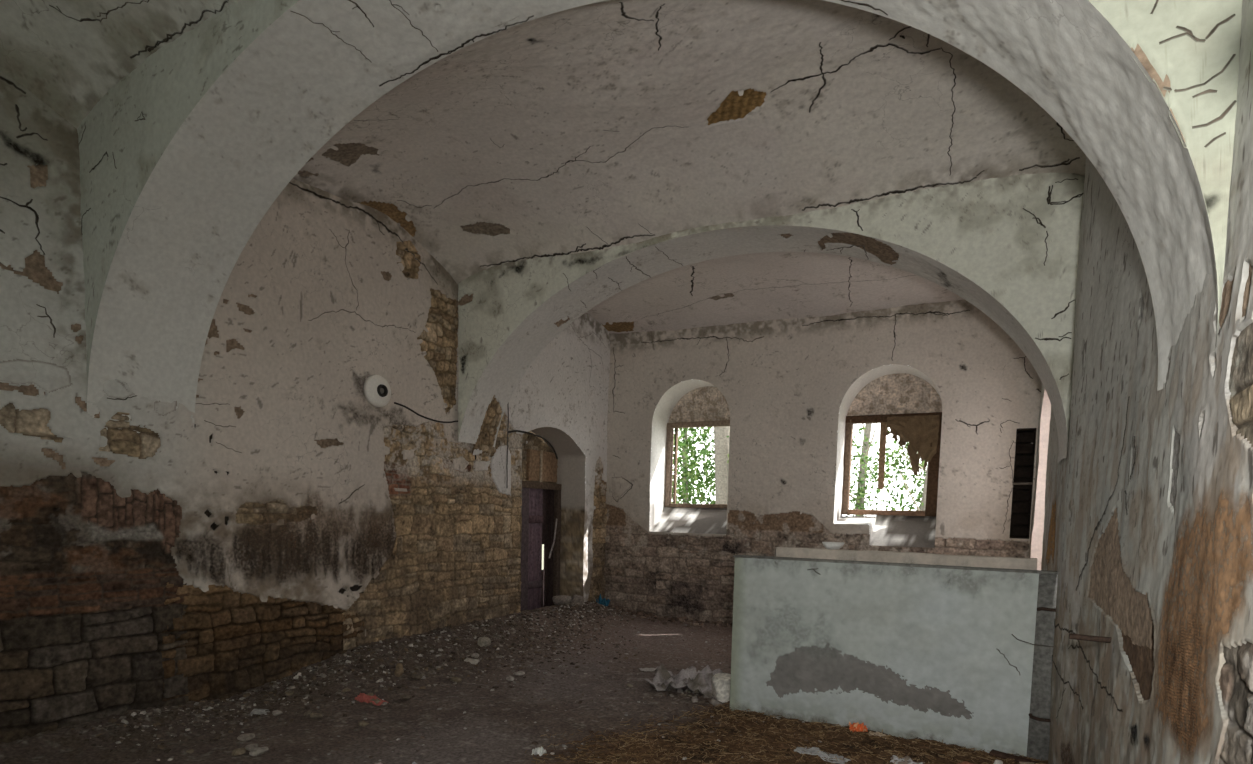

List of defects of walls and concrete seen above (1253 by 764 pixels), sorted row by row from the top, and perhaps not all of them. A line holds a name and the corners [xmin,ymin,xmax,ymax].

crack [291,0,534,87]
peeling [707,88,767,125]
crack [1150,0,1237,148]
peeling [0,250,63,294]
crack [289,126,689,333]
crack [480,0,984,414]
flaking render [817,232,900,265]
crack [1019,121,1084,266]
water stain [179,495,395,584]
flaking render [0,288,1030,762]
peeling [1088,508,1154,700]
flaking render [1218,641,1253,764]